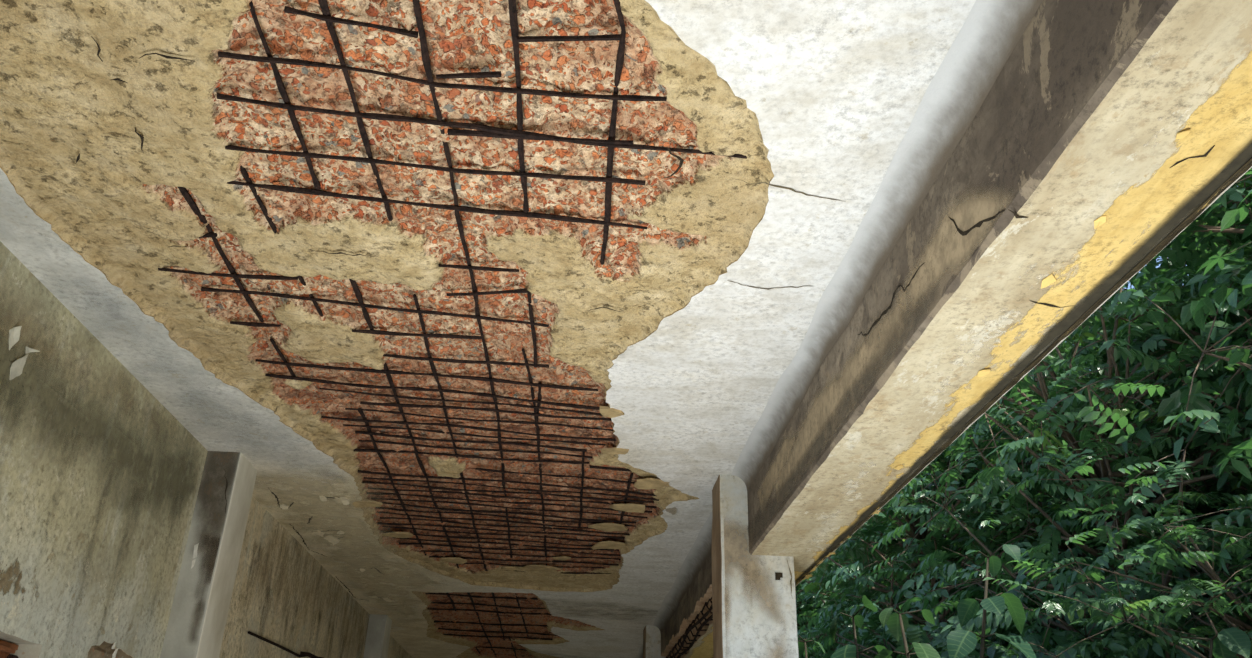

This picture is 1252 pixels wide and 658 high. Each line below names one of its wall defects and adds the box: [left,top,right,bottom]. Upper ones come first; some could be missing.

water stain [0,317,239,575]
spalling [0,0,774,658]
crack [857,263,924,336]
crack [948,209,1028,236]
peeling [775,50,1252,584]
water stain [192,601,203,639]